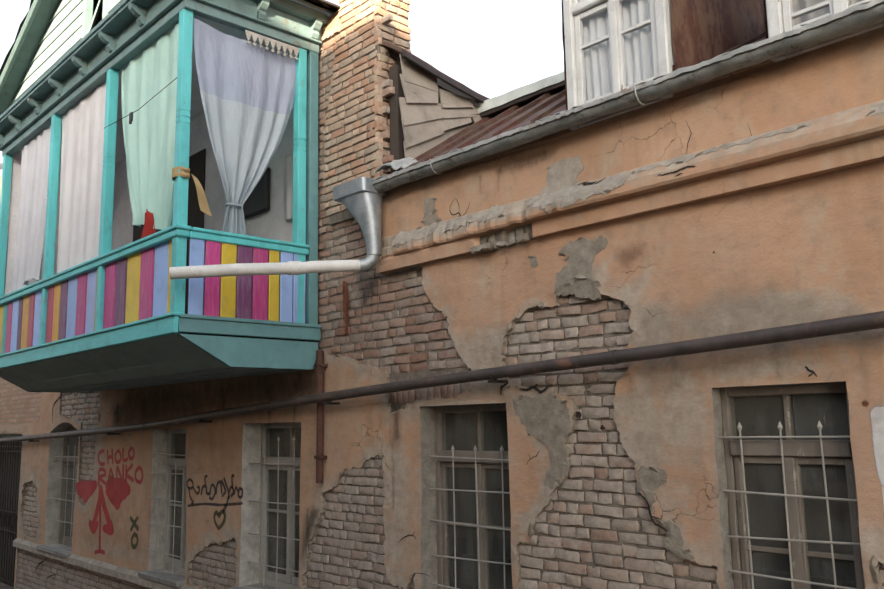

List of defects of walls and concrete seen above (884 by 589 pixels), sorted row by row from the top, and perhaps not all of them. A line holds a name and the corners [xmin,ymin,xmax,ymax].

flaking render [318,32,367,261]
flaking render [370,79,395,139]
crack [659,121,695,176]
flaking render [392,198,507,247]
flaking render [301,265,471,413]
flaking render [504,235,634,365]
flaking render [61,392,101,481]
flaking render [16,482,152,589]
flaking render [188,539,237,589]
flaking render [305,455,415,589]
flaking render [508,363,719,589]
flaking render [869,555,884,589]